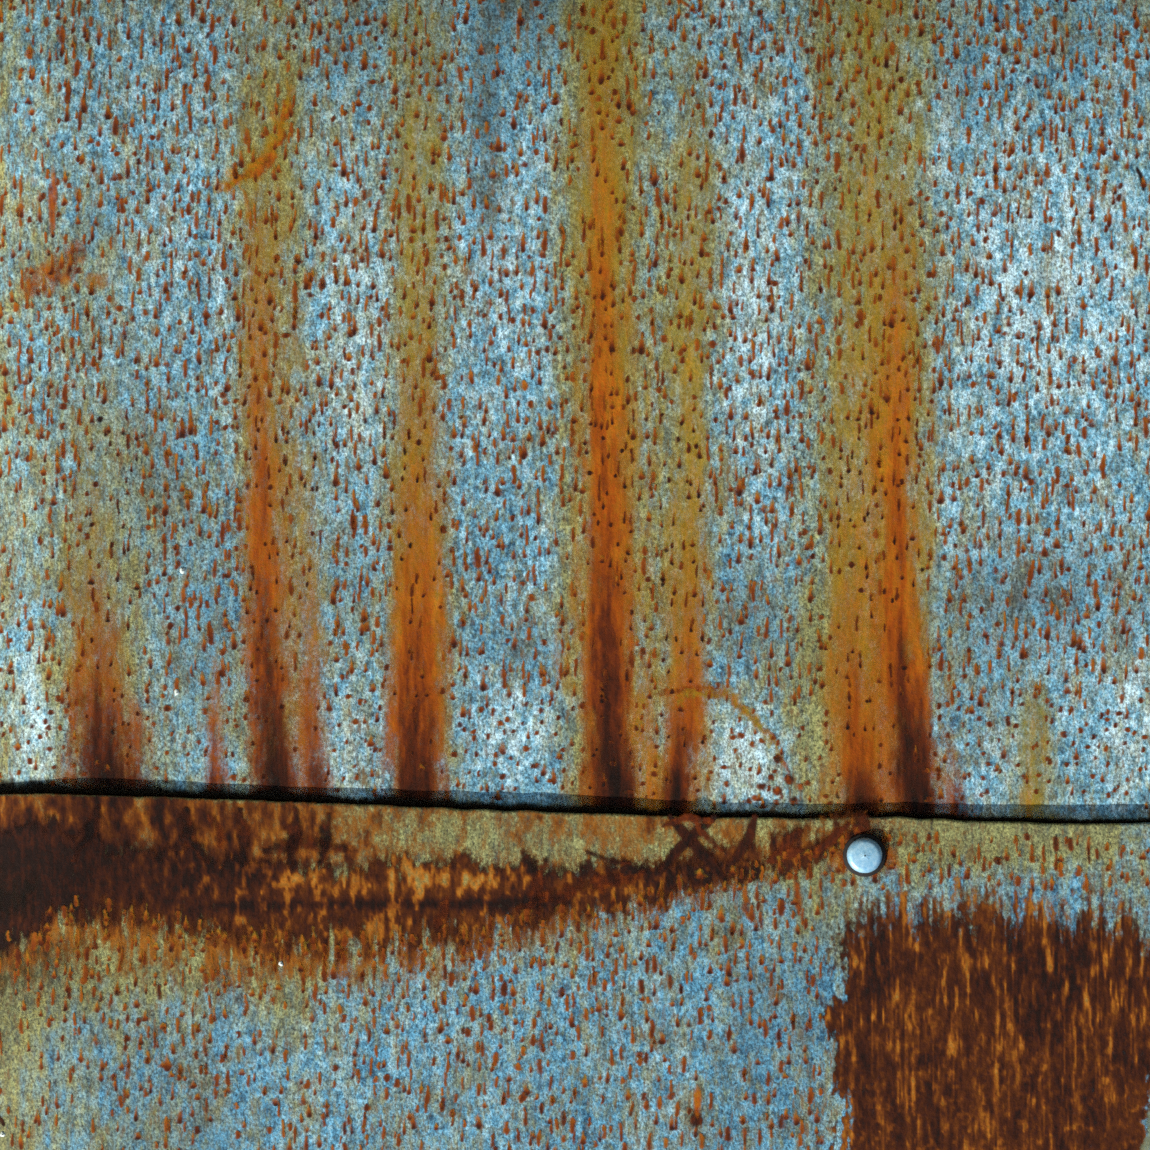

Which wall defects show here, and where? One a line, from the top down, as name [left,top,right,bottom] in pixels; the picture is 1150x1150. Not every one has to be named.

corrosion [499,60,566,130]
corrosion [664,0,757,139]
corrosion [1078,0,1149,140]
corrosion [489,137,528,179]
corrosion [1028,231,1061,256]
corrosion [1077,237,1150,339]
corrosion [944,399,984,436]
corrosion [34,439,98,618]
corrosion [0,544,60,681]
corrosion [962,483,1150,709]
corrosion [468,744,519,800]
corrosion [1061,694,1148,798]